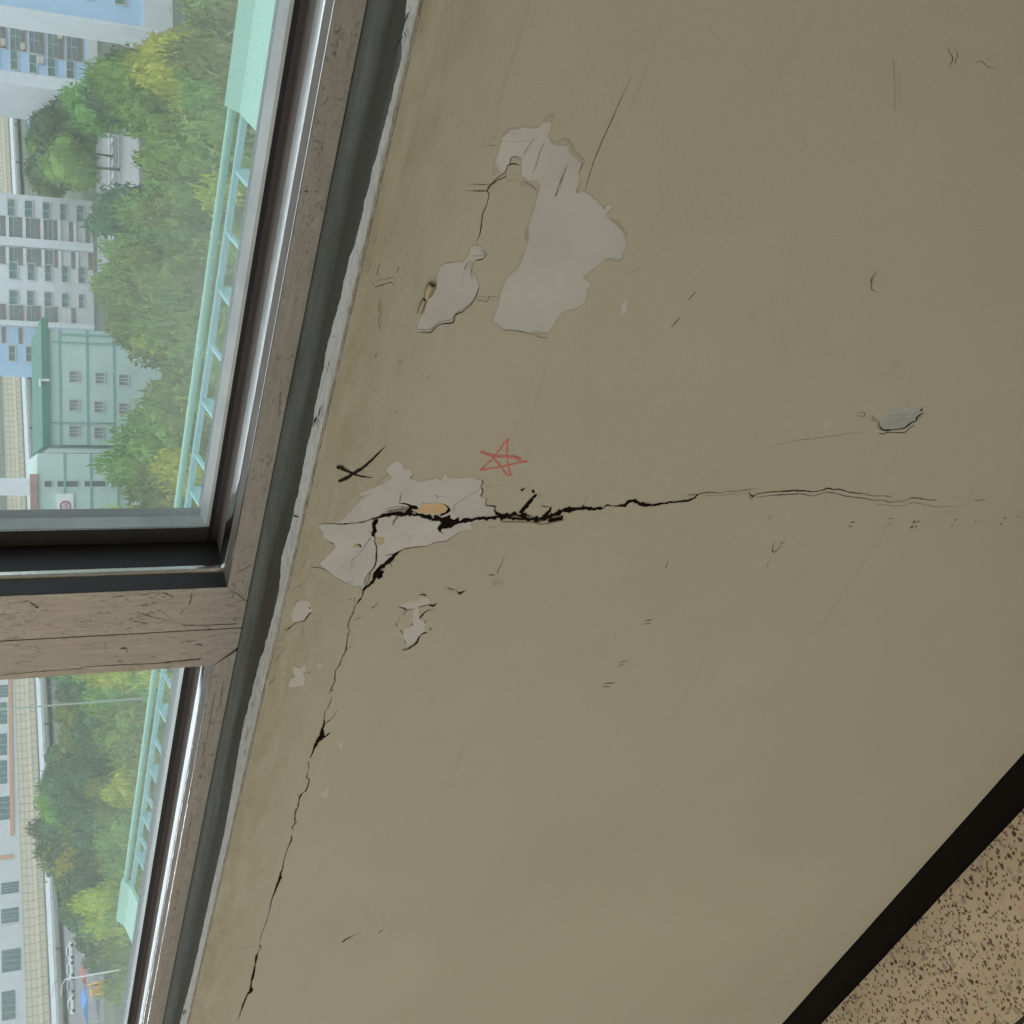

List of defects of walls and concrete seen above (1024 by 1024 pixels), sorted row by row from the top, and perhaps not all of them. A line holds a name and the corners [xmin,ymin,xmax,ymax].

peeling [416,113,628,339]
flaking render [180,0,422,1024]
flaking render [313,460,497,591]
peeling [396,591,436,651]
peeling [862,405,923,434]
crack [238,481,927,1018]